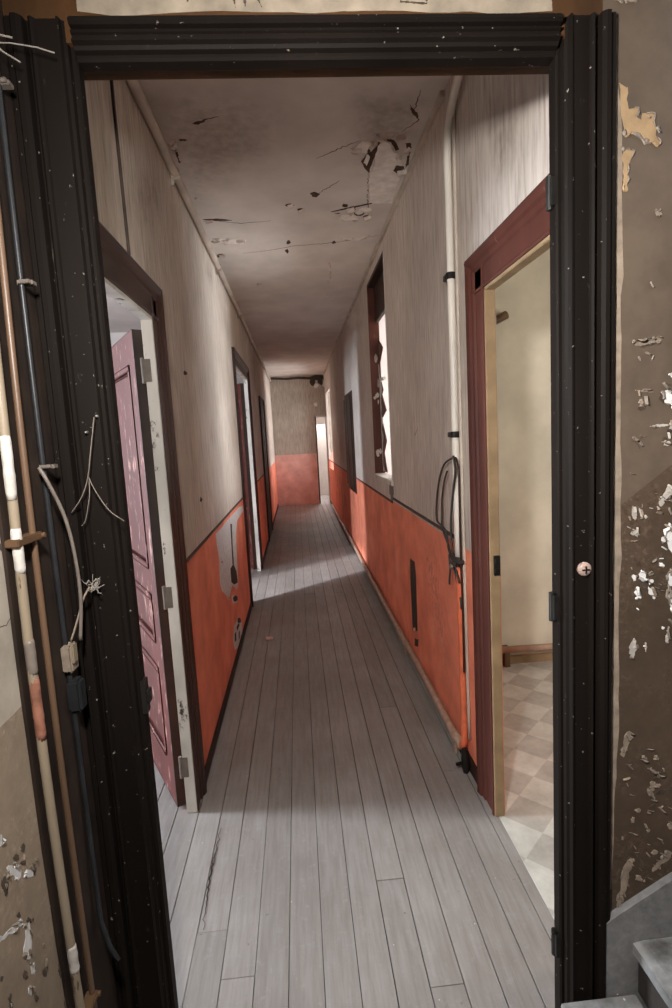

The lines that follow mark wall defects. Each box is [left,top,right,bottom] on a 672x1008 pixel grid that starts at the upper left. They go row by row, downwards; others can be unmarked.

flaking render [76,0,552,16]
peeling [331,133,412,222]
peeling [610,18,672,908]
peeling [216,506,243,603]
peeling [233,617,242,649]
peeling [6,843,39,881]
peeling [0,912,48,1001]
peeling [67,942,80,975]